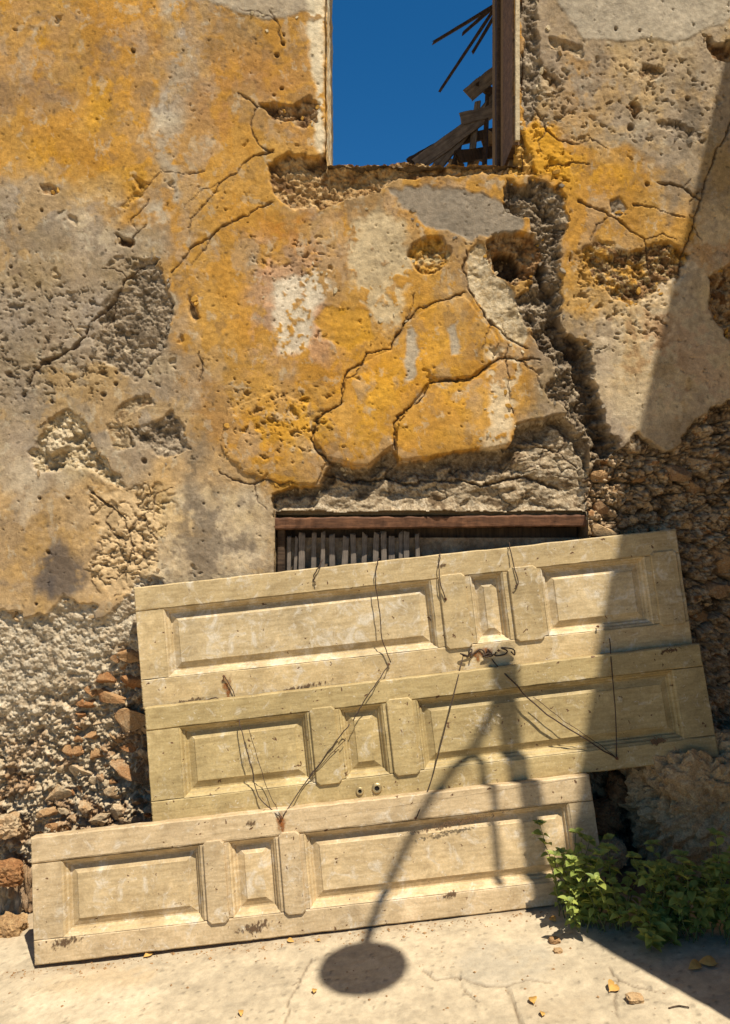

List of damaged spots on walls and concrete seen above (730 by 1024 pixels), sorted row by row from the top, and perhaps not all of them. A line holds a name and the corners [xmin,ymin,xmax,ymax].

crack [30,93,299,386]
crack [311,249,579,491]
flaking render [197,0,730,731]
crack [577,124,730,277]
flaking render [0,393,192,915]
flaking render [589,769,634,846]